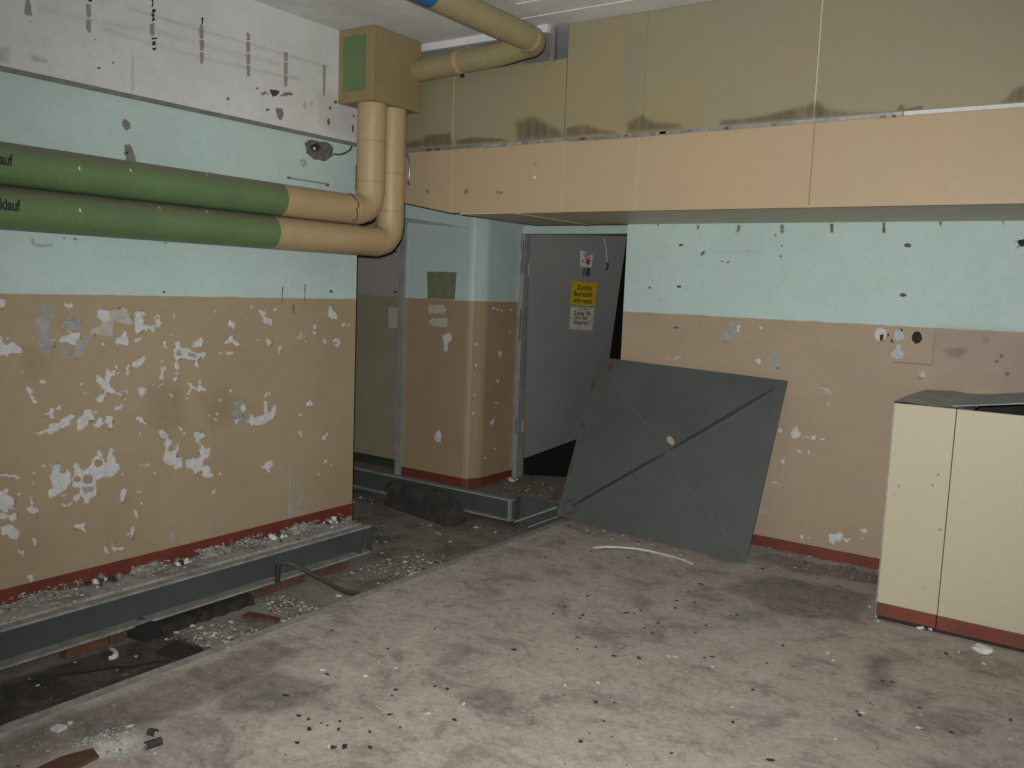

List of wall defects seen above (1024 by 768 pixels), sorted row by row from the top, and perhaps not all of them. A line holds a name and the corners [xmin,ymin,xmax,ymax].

flaking render [305,140,333,161]
peeling [0,303,175,360]
peeling [219,320,240,355]
peeling [250,306,277,326]
peeling [443,333,452,351]
flaking render [875,327,905,359]
peeling [26,334,221,494]
peeling [208,389,276,429]
peeling [778,425,825,455]
peeling [0,448,123,556]
peeling [104,489,143,553]
peeling [828,528,868,544]